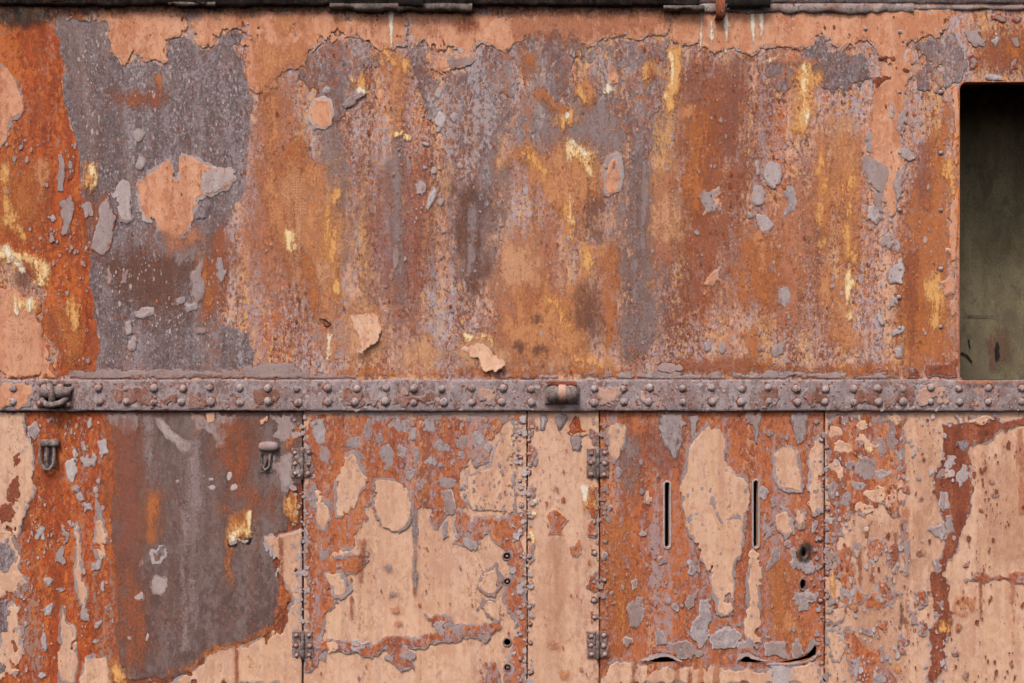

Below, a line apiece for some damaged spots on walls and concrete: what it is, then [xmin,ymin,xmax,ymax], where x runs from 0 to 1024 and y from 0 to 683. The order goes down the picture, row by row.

corrosion [0,158,84,369]
corrosion [81,16,678,410]
peeling [0,7,978,378]
corrosion [505,11,959,470]
corrosion [104,419,162,683]
corrosion [168,538,291,683]
corrosion [154,360,308,584]
peeling [0,380,535,683]
peeling [528,444,538,467]
peeling [581,297,1024,683]
corrosion [829,485,1024,683]